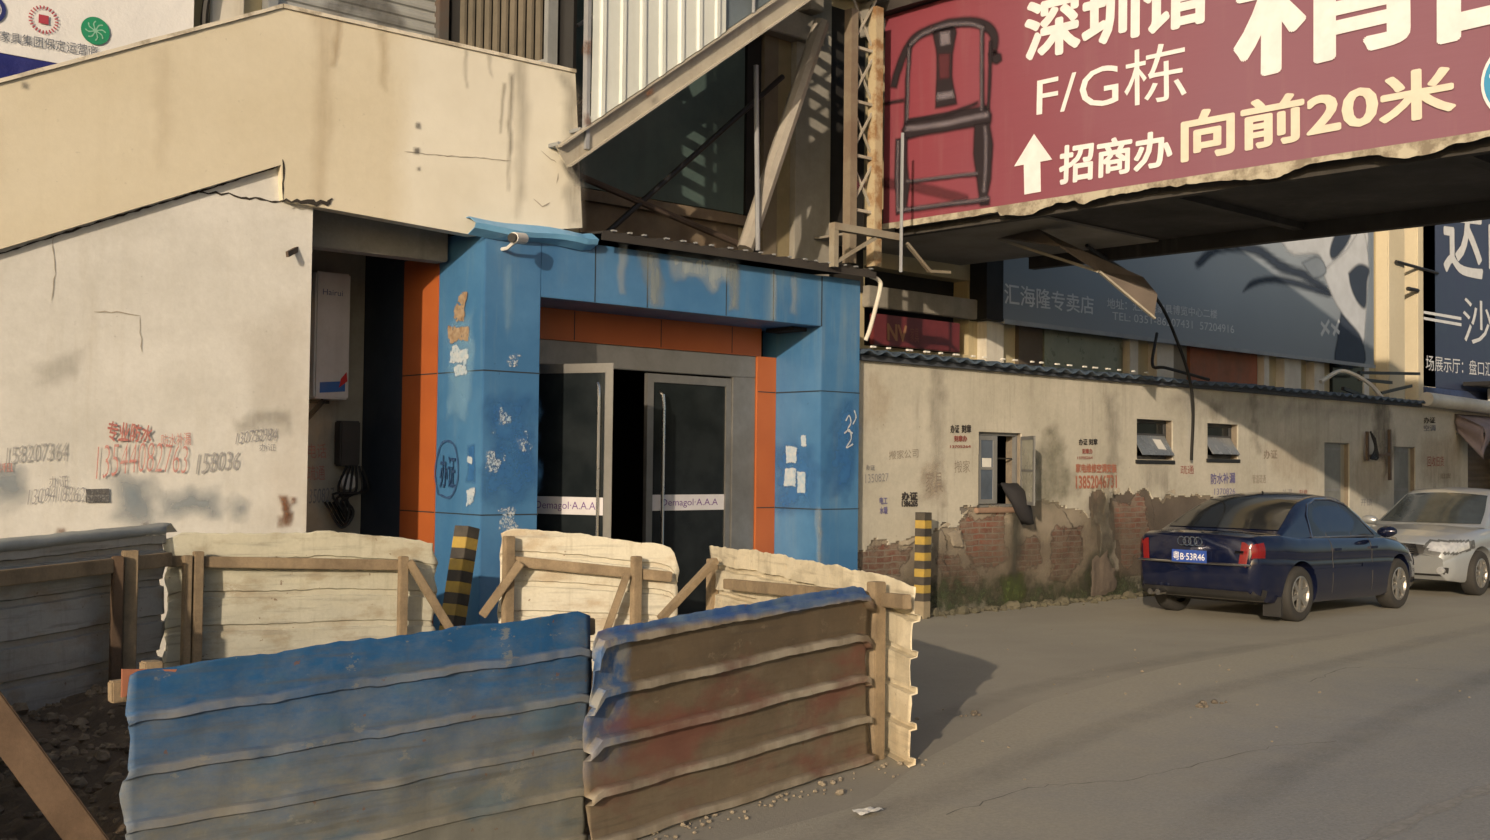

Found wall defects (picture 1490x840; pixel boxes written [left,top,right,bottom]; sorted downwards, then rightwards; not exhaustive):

crack [0,159,333,300]
spalling [857,488,1214,605]